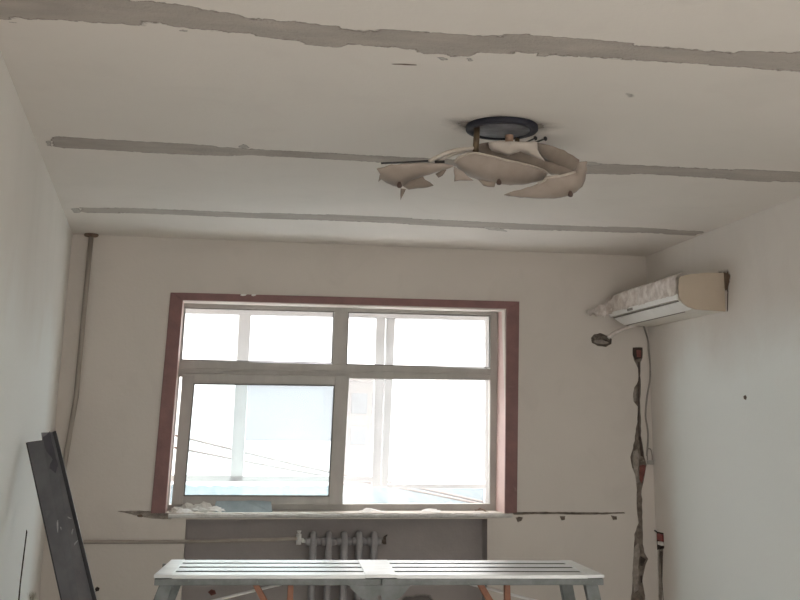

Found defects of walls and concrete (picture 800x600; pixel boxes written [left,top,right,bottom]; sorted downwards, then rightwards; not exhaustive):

flaking render [0,0,800,71]
flaking render [46,137,456,166]
flaking render [586,162,800,182]
flaking render [72,207,703,236]